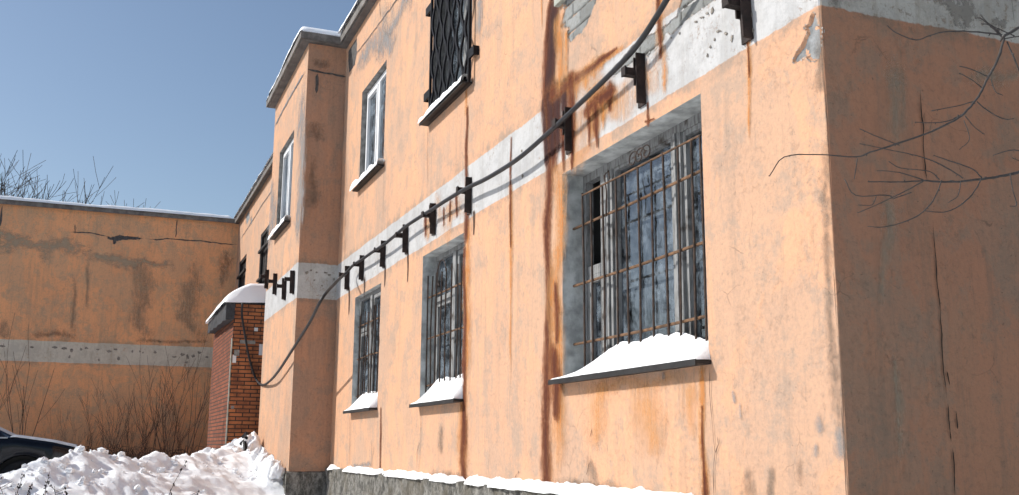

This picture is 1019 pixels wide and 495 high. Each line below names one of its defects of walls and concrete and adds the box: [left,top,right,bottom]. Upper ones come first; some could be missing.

spalling [561,0,596,42]
corrosion [656,0,666,89]
spalling [613,0,715,77]
spalling [792,12,825,64]
crack [919,90,927,178]
crack [151,192,271,245]
corrosion [541,0,621,482]
corrosion [443,196,475,480]
crack [933,228,958,491]
corrosion [698,367,708,495]